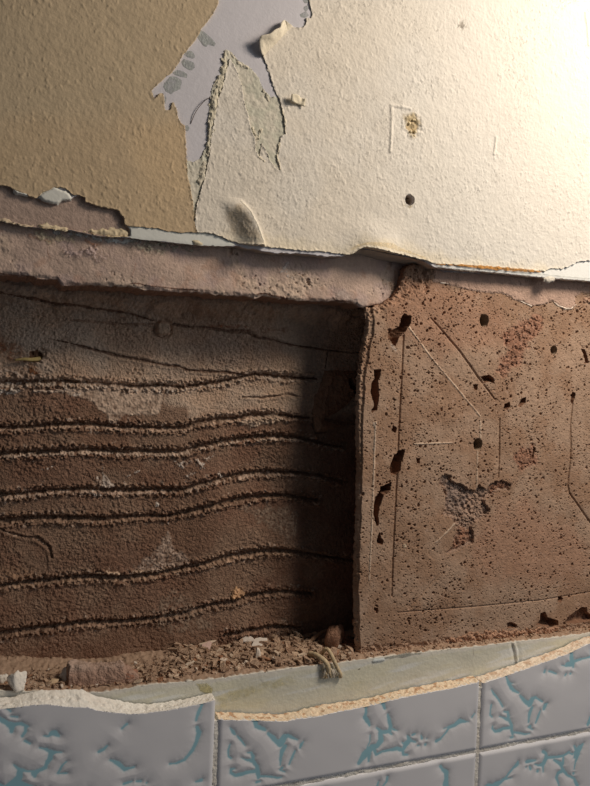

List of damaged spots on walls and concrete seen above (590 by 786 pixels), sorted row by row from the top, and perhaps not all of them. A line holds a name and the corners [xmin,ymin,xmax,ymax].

peeling [152,0,312,187]
peeling [435,261,590,283]
spalling [439,474,511,553]
spalling [445,622,559,643]
spalling [0,678,215,714]
spalling [215,636,590,721]